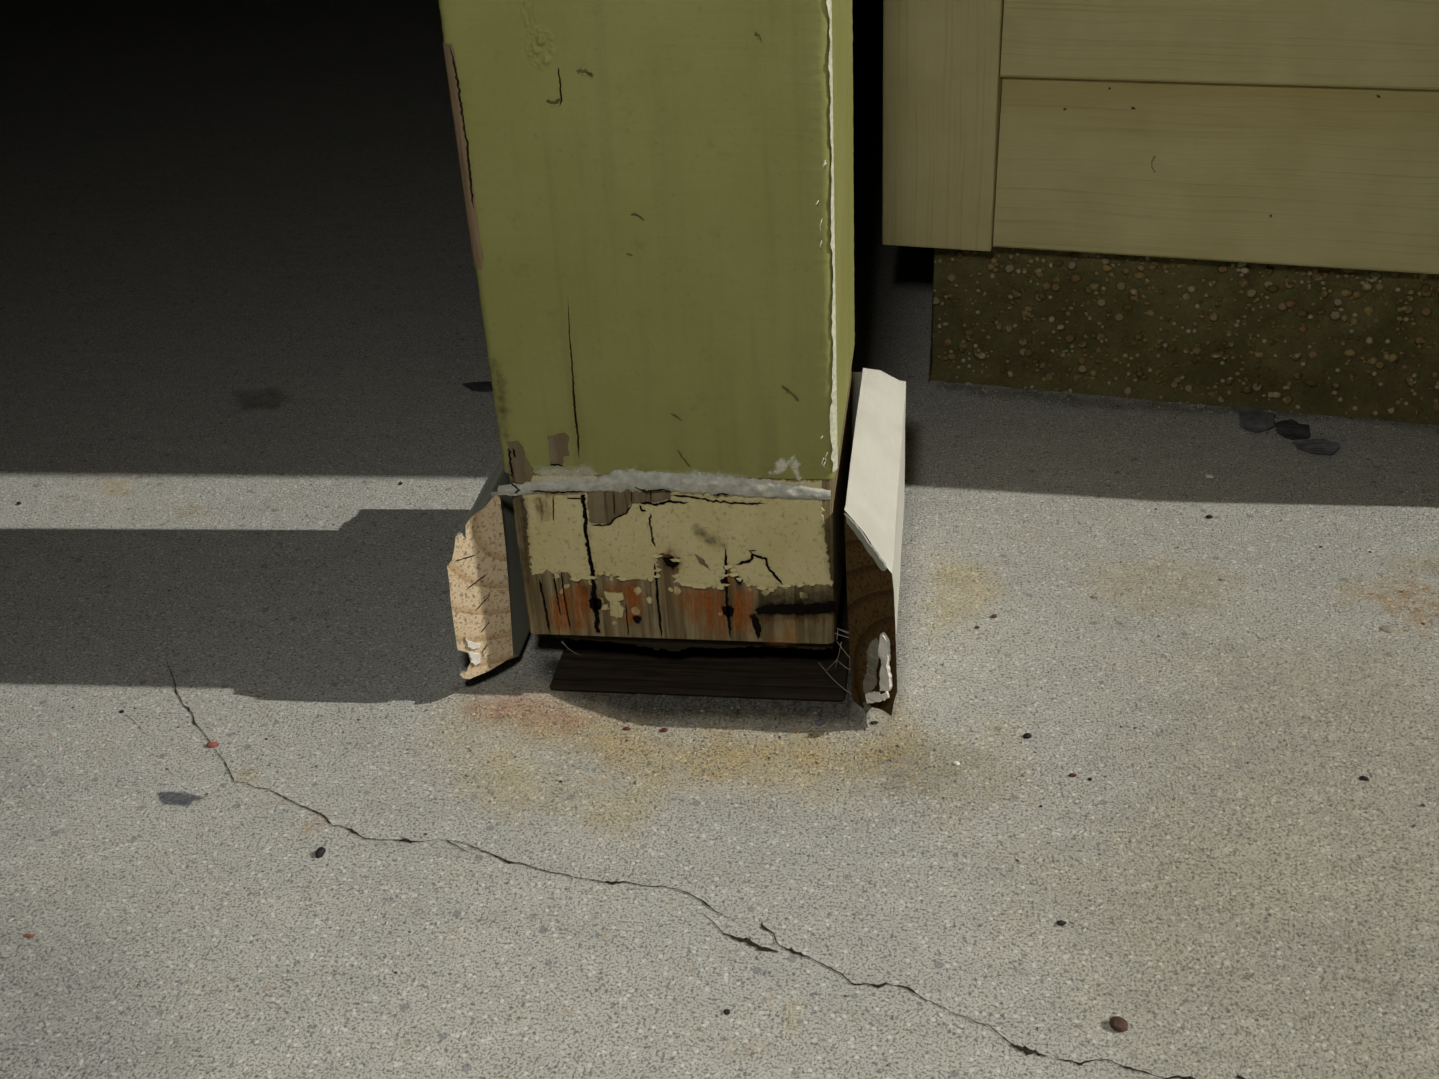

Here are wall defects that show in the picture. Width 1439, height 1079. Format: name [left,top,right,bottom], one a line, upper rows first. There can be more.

peeling [604,591,625,618]
peeling [586,489,671,526]
crack [511,306,764,637]
crack [166,657,1196,1079]